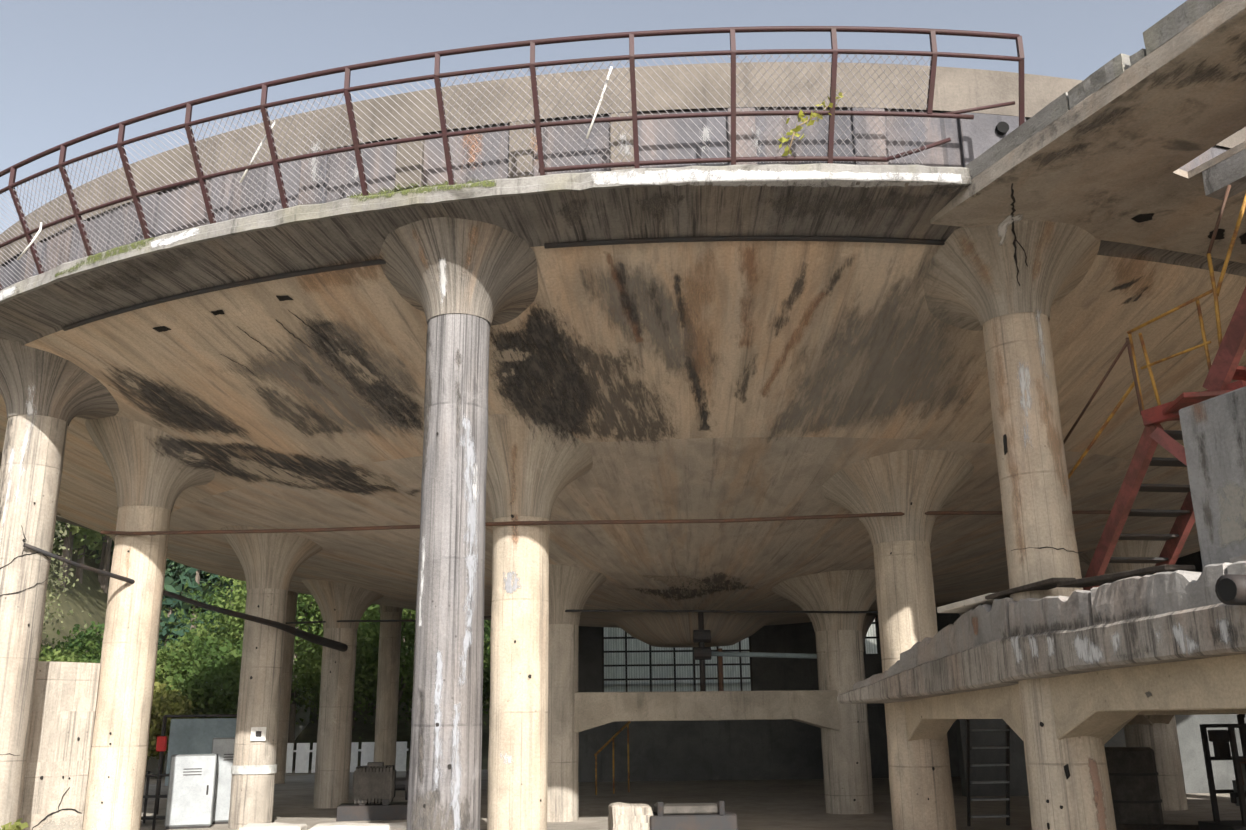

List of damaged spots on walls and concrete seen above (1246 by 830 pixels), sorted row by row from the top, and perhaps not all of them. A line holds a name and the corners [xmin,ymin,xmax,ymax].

crack [1011,183,1028,286]
damp [100,357,421,496]
damp [242,318,432,476]
damp [491,308,674,442]
damp [583,264,713,431]
damp [735,359,755,402]
crack [0,526,52,596]